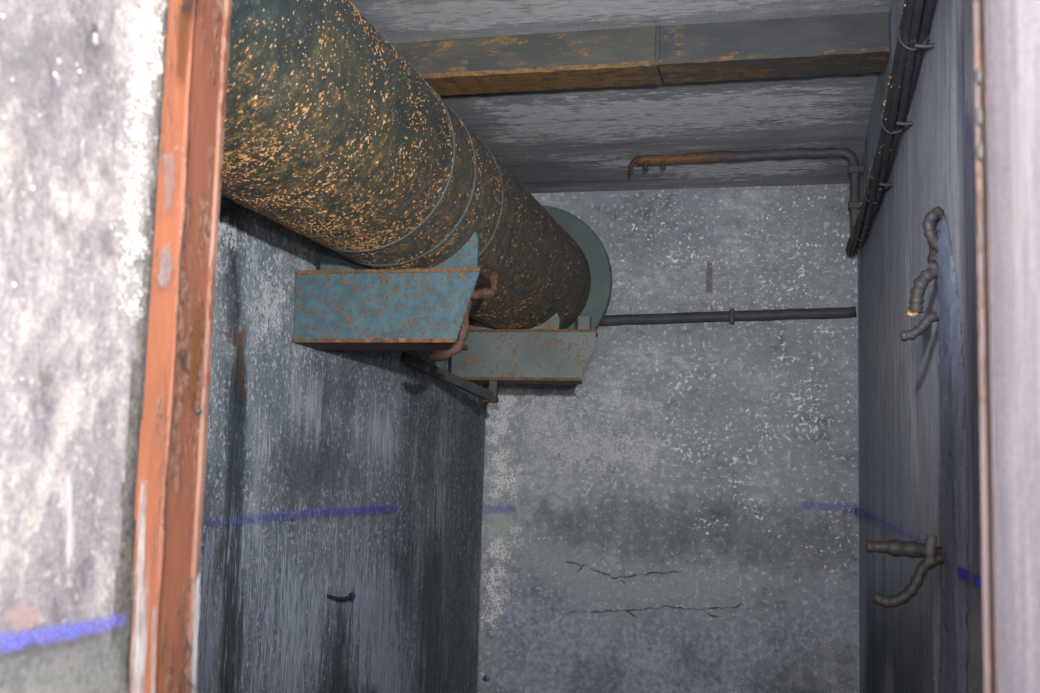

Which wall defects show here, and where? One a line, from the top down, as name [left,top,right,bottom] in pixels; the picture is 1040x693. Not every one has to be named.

crack [567,561,681,583]
crack [570,603,744,617]
leakage [321,595,358,693]